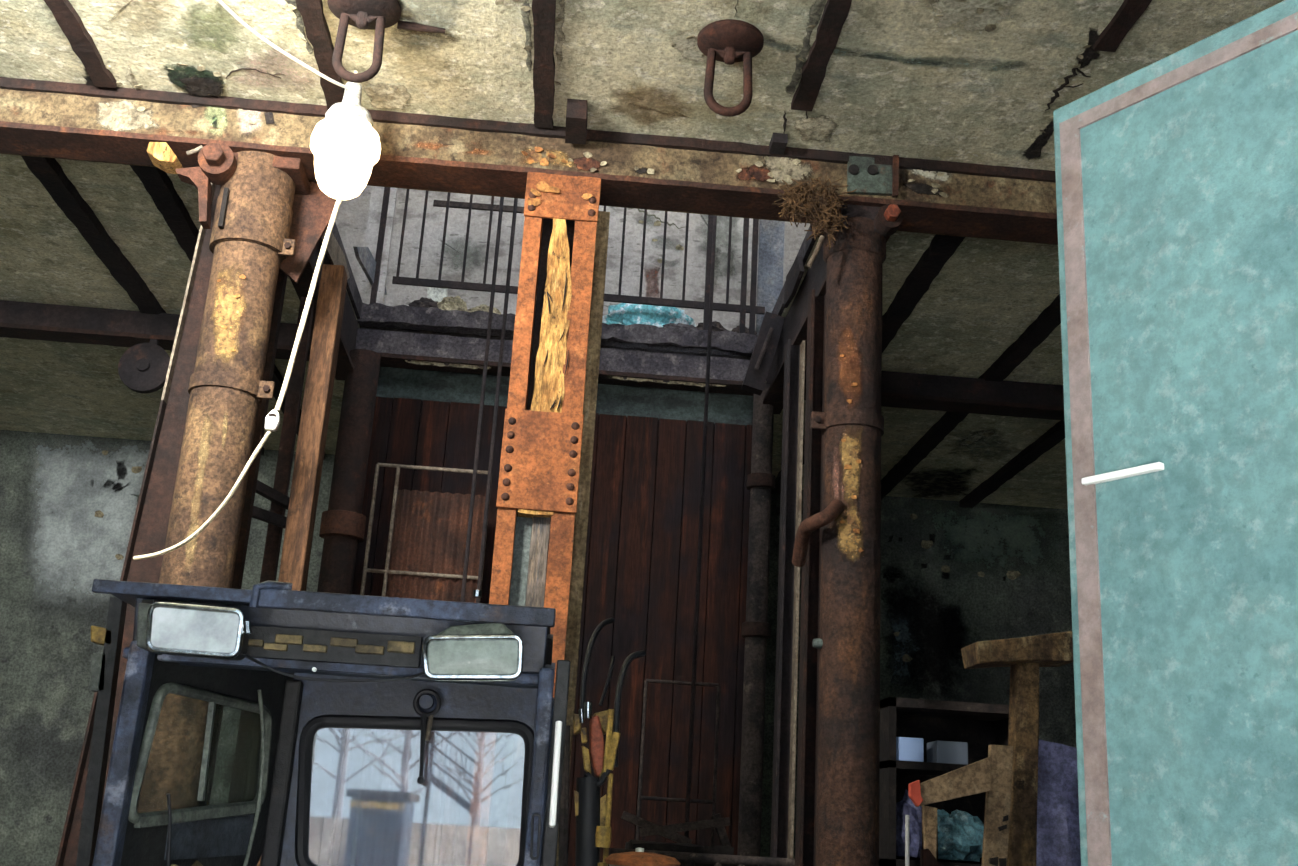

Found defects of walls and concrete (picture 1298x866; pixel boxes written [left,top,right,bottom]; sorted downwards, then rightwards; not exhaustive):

spalling [285,0,313,54]
spalling [786,0,826,94]
crack [1045,63,1091,111]
corrosion [833,449,844,498]
damp [883,566,969,700]